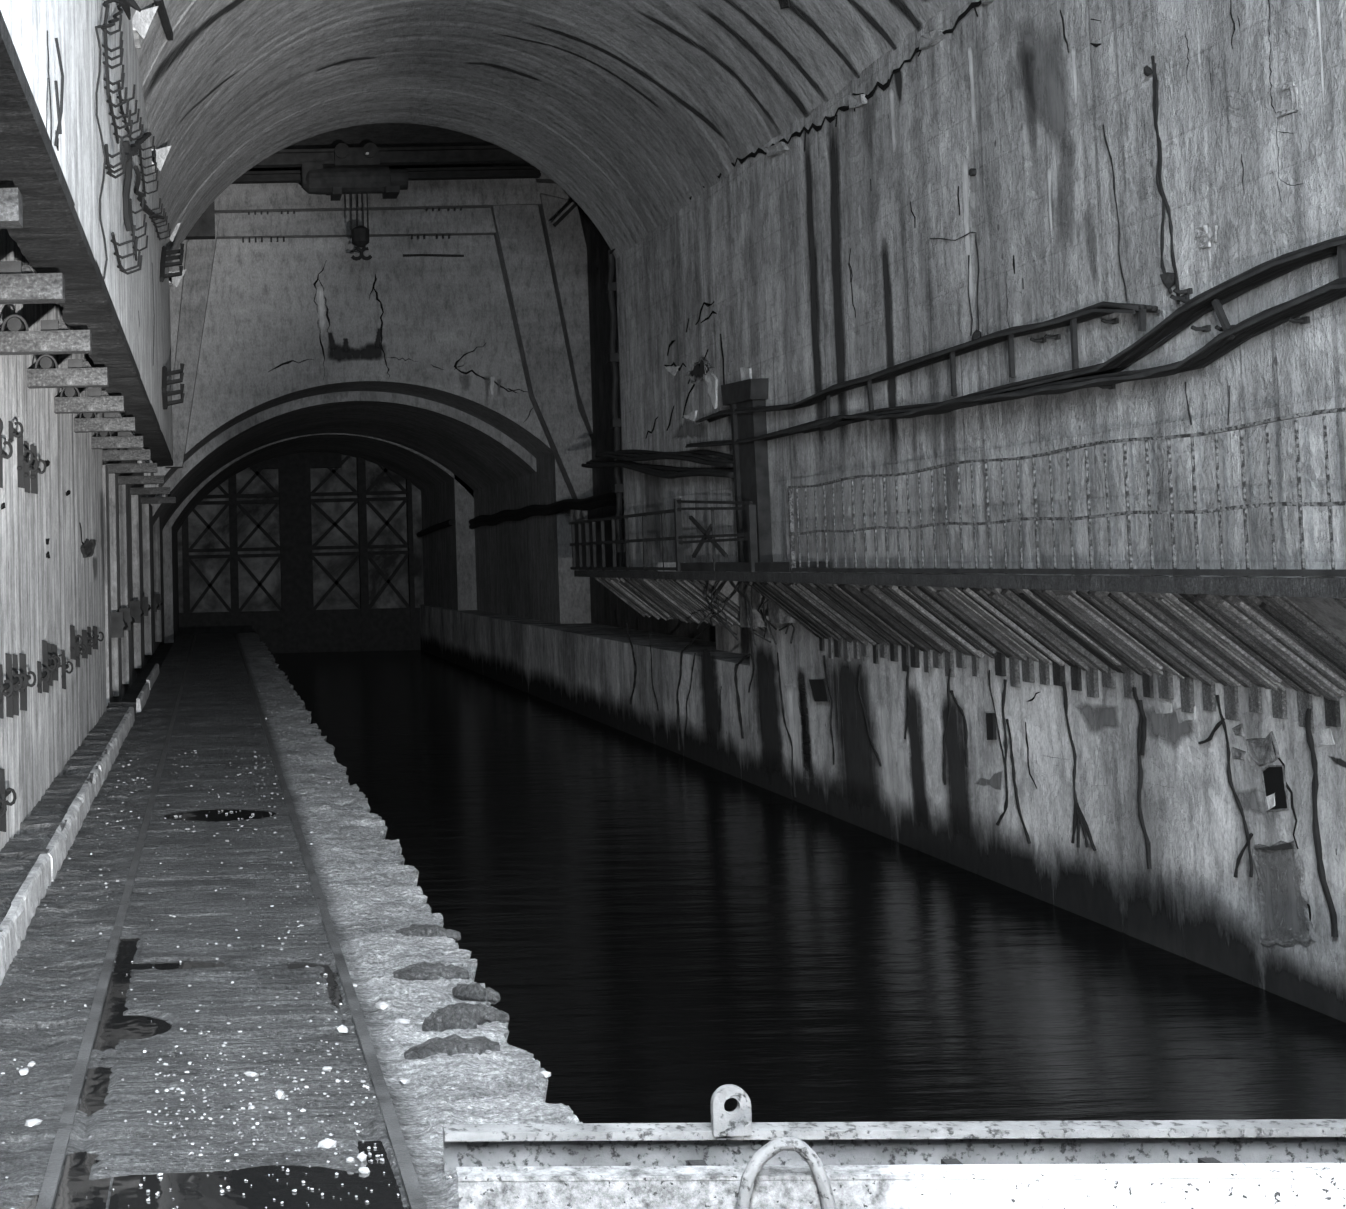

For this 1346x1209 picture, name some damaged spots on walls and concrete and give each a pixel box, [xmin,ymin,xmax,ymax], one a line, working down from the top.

crack [690,0,994,200]
crack [268,262,534,423]
spalling [1232,724,1317,948]